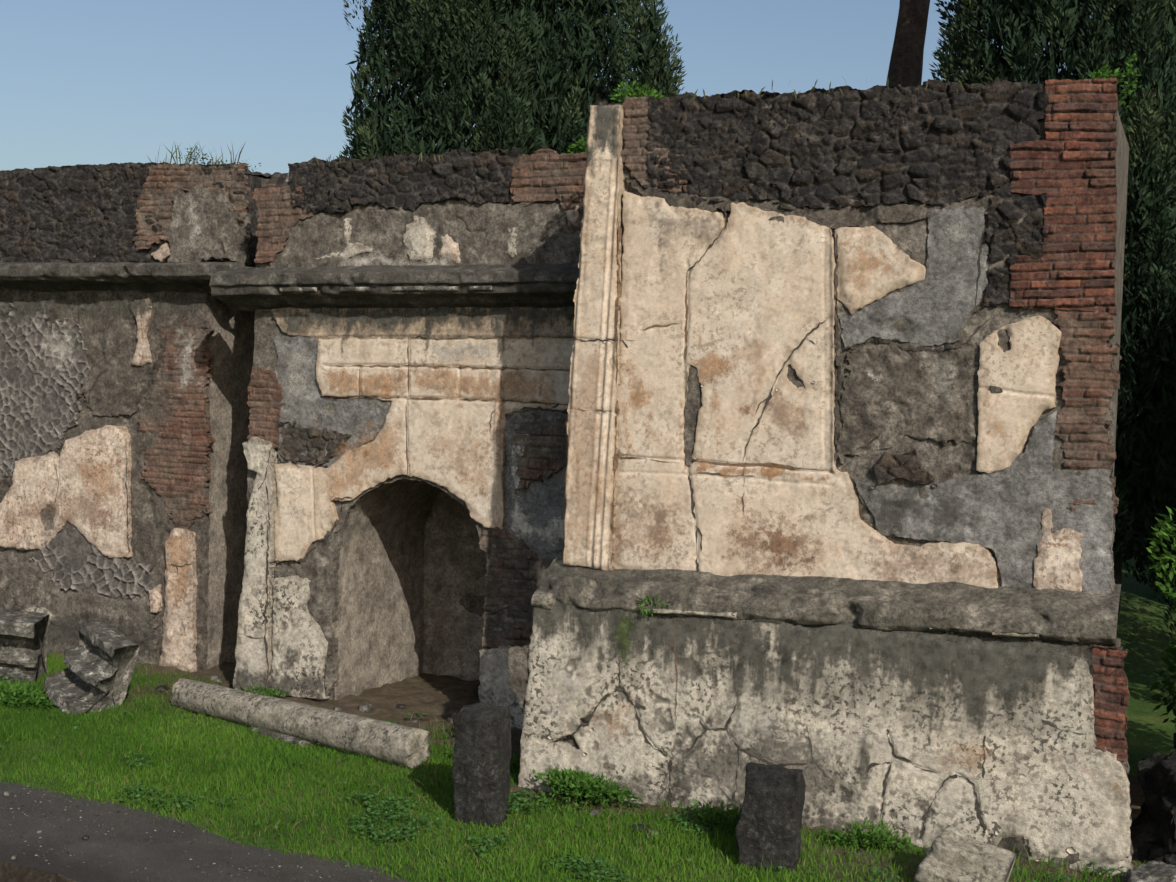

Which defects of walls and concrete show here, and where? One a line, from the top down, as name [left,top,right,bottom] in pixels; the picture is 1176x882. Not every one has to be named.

leakage [284,306,575,361]
spalling [849,209,933,270]
crack [842,232,989,356]
crack [742,319,827,519]
spalling [834,300,1003,522]
spalling [504,408,568,561]
crack [688,473,702,571]
leakage [533,600,1093,728]
crack [865,729,992,844]